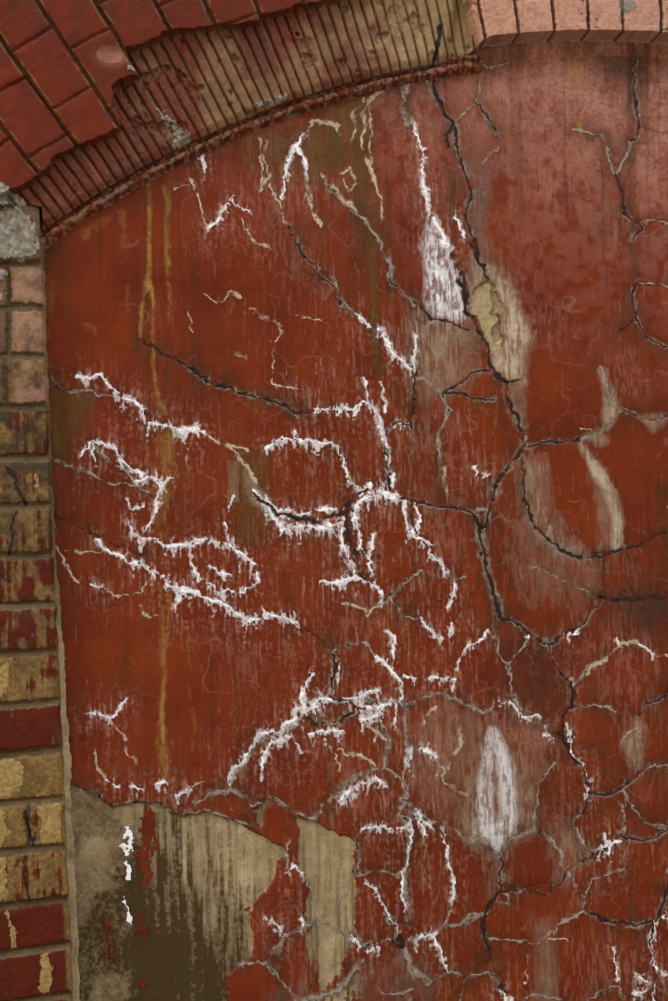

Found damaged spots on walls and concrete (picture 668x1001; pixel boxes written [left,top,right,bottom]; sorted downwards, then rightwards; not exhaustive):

leakage [401,83,463,322]
crack [426,24,510,279]
crack [571,59,668,242]
leakage [51,372,258,484]
leakage [55,440,299,626]
leakage [264,430,351,480]
crack [56,189,668,1001]
leakage [352,377,387,441]
leakage [343,631,457,741]
spalling [467,280,503,352]
peeling [0,758,25,949]
peeling [37,786,360,1001]